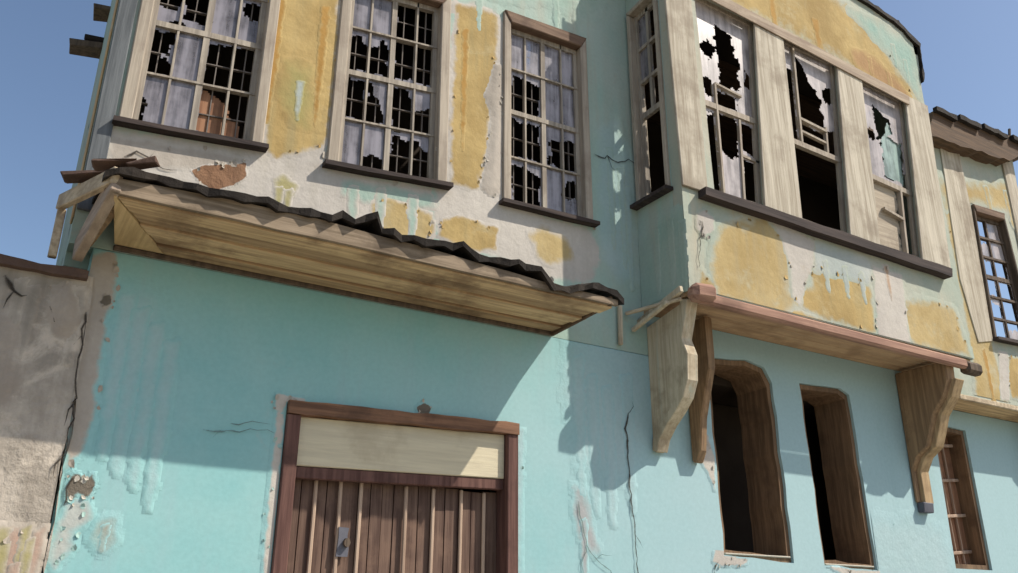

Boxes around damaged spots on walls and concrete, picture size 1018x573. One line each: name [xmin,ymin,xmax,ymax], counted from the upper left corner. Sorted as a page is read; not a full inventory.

peeling [731,0,924,104]
peeling [107,0,604,286]
crack [4,276,26,306]
peeling [694,208,1018,403]
crack [53,313,87,497]
crack [207,421,272,432]
crack [578,504,612,573]
crack [624,402,641,573]